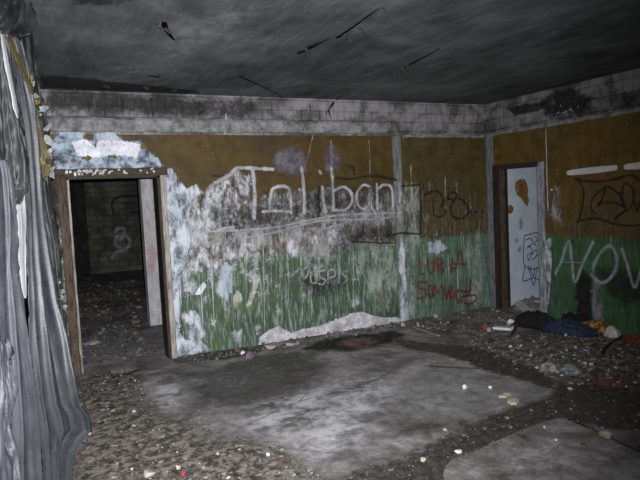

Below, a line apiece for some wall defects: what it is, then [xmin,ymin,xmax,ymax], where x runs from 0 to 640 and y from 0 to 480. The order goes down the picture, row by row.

crack [296,7,386,60]
peeling [40,122,447,357]